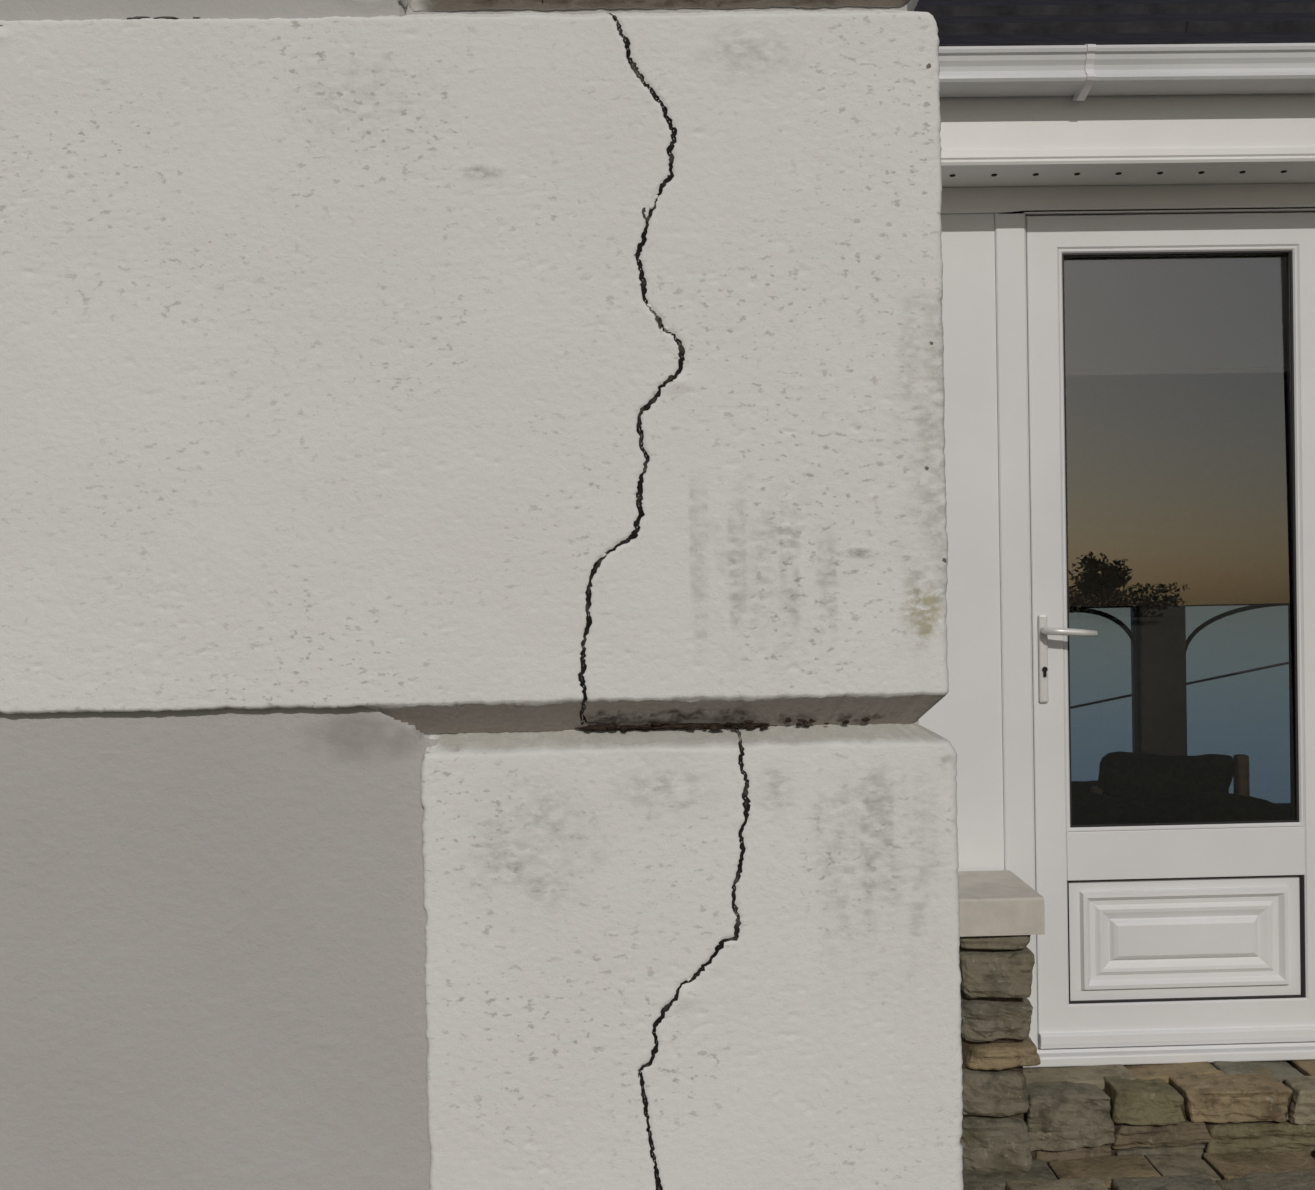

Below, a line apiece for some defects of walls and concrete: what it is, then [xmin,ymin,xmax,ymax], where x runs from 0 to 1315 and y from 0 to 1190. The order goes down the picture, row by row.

crack [578,13,685,725]
crack [638,728,751,1190]